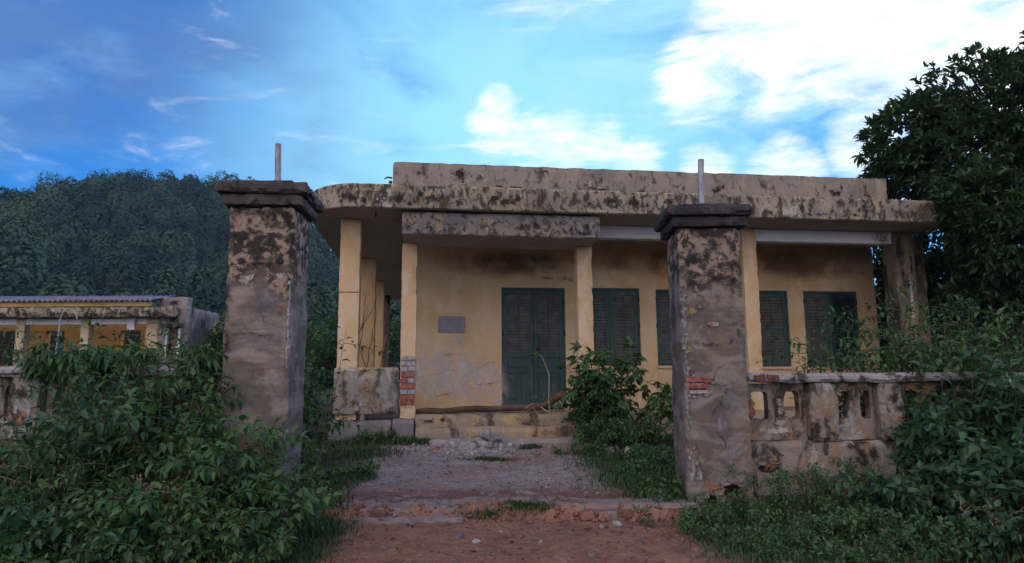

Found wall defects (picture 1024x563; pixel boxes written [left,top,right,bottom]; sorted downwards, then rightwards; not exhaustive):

mould [389,168,482,207]
mould [488,185,523,206]
mould [584,184,649,209]
mould [231,208,306,267]
leakage [685,229,738,297]
flaking render [398,356,417,412]
flaking render [680,289,747,503]